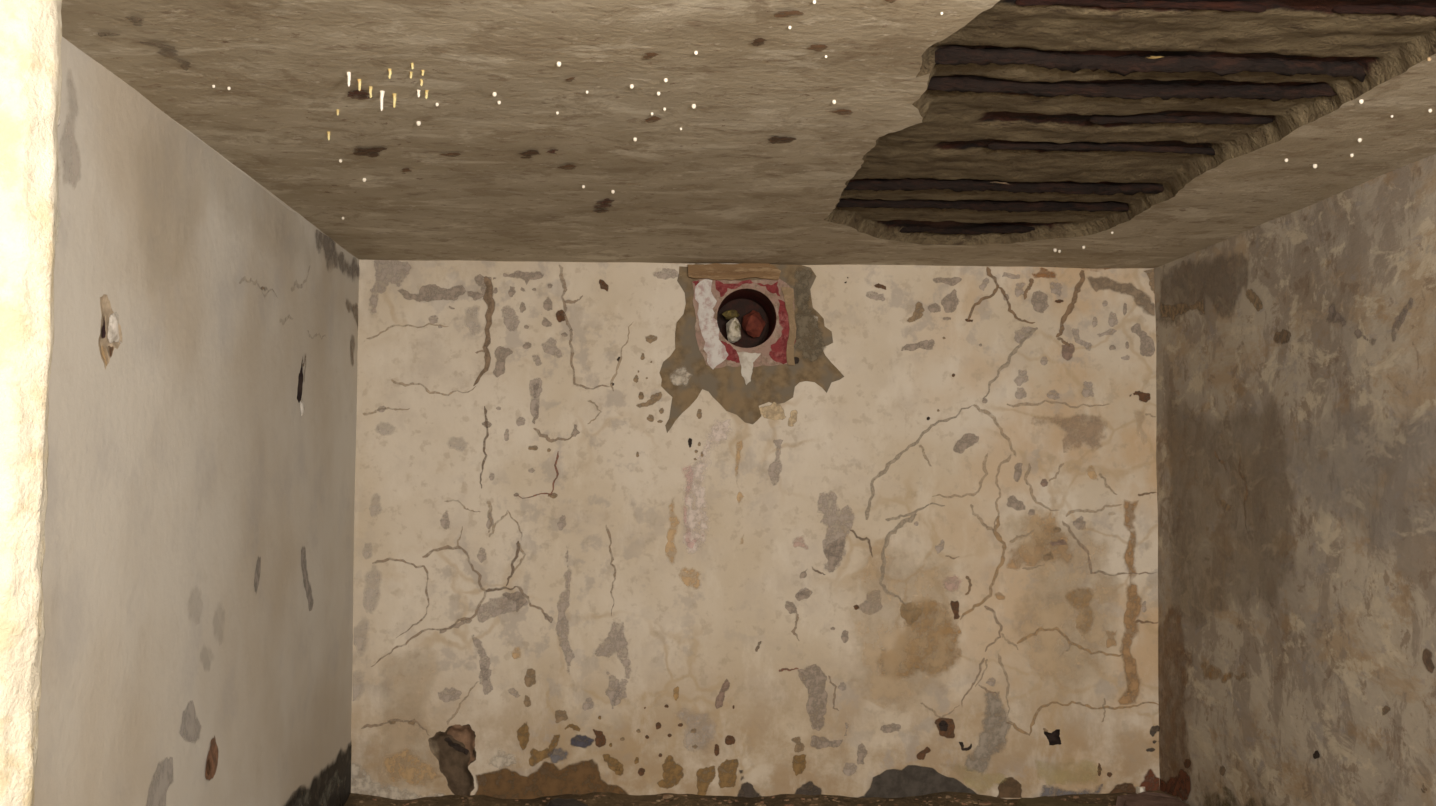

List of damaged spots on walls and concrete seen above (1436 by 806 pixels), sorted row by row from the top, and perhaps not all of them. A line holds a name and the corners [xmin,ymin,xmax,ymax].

spalling [824,0,1436,245]
spalling [98,294,122,369]
spalling [297,356,306,417]
crack [363,274,631,667]
peeling [654,264,844,485]
crack [850,267,1159,736]
crack [364,688,473,735]
flaking render [428,724,476,796]
rust [1066,589,1094,633]
rust [1106,501,1147,704]
rust [1097,610,1244,801]